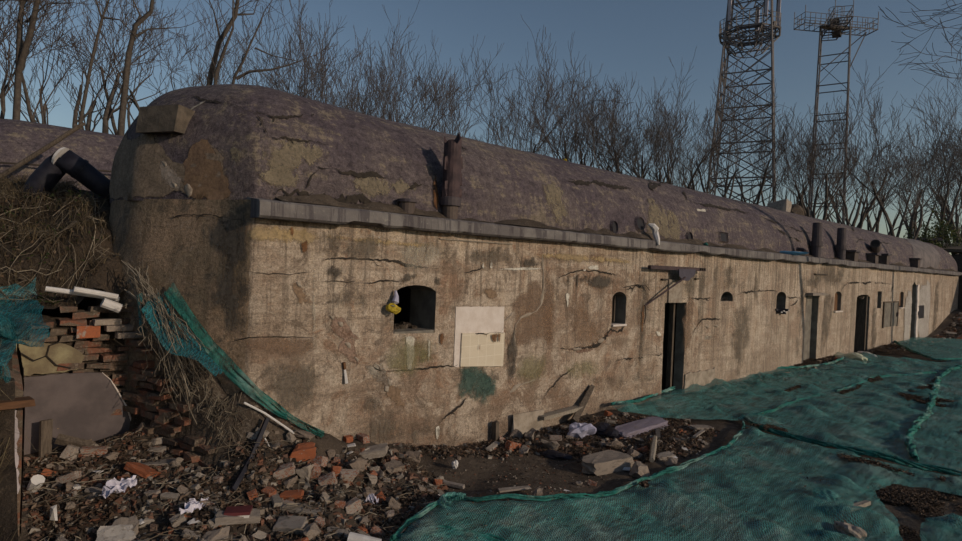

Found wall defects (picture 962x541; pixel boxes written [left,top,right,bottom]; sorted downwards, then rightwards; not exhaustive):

peeling [109,133,231,200]
crack [191,96,429,207]
crack [246,257,437,284]
crack [373,364,457,372]
water stain [458,366,496,403]
crack [540,327,624,403]
crack [440,398,467,423]